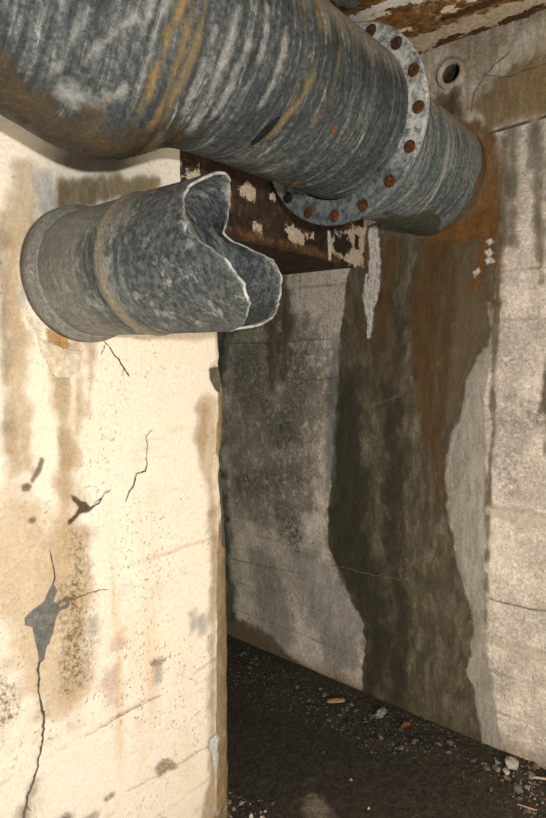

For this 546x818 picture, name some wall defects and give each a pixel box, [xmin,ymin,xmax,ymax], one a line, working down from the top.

corrosion [433,0,545,48]
water stain [474,13,546,199]
water stain [38,172,160,213]
corrosion [426,90,502,291]
water stain [0,166,31,379]
spalling [68,496,93,524]
crack [101,341,130,377]
crack [91,430,152,508]
water stain [216,207,516,750]
water stain [518,373,546,428]
water stain [0,507,87,709]
crack [23,660,45,818]